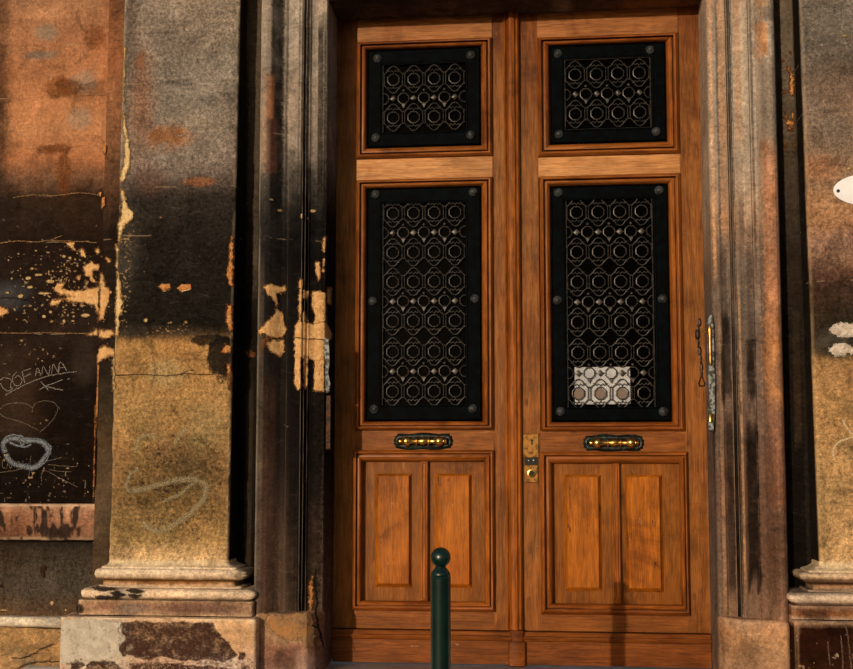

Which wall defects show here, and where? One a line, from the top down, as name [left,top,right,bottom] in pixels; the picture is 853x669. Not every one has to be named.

spalling [0,46,138,502]
spalling [157,283,192,292]
spalling [258,236,333,392]
damp [818,330,847,353]
spalling [91,586,143,600]
peeling [59,604,252,669]